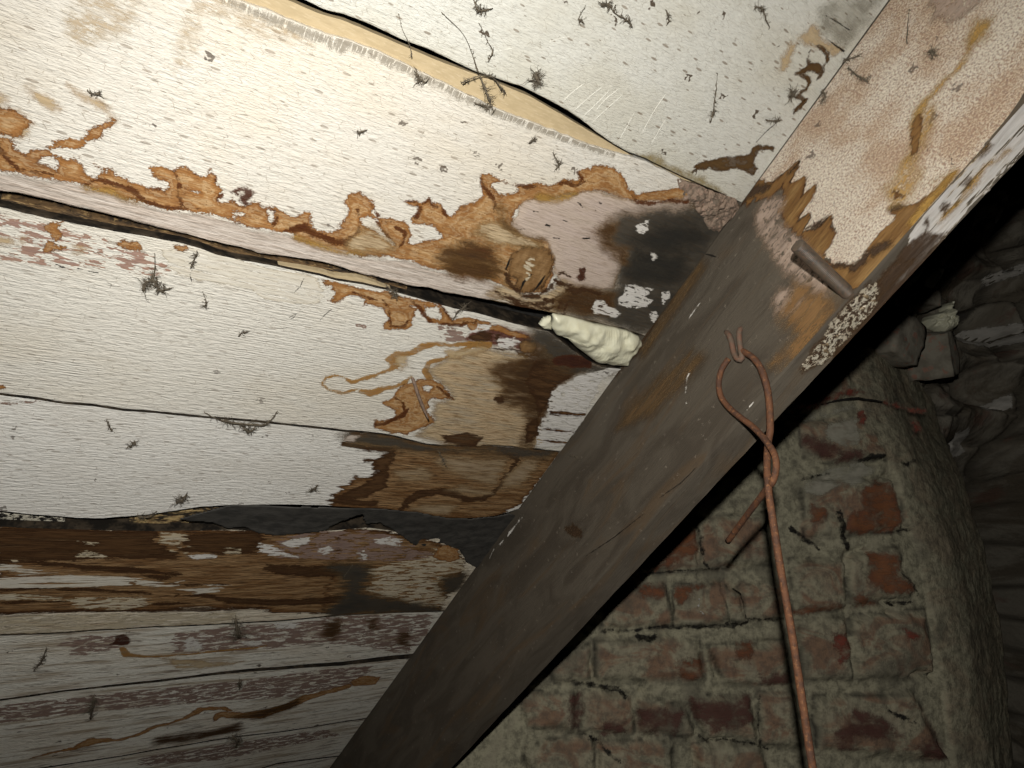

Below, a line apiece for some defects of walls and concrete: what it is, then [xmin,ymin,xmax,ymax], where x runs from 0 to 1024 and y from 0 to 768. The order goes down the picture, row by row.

peeling [756,0,1024,314]
peeling [0,174,692,323]
water stain [0,21,989,518]
peeling [438,326,465,342]
peeling [416,349,621,449]
water stain [0,527,468,634]
crack [788,510,850,551]